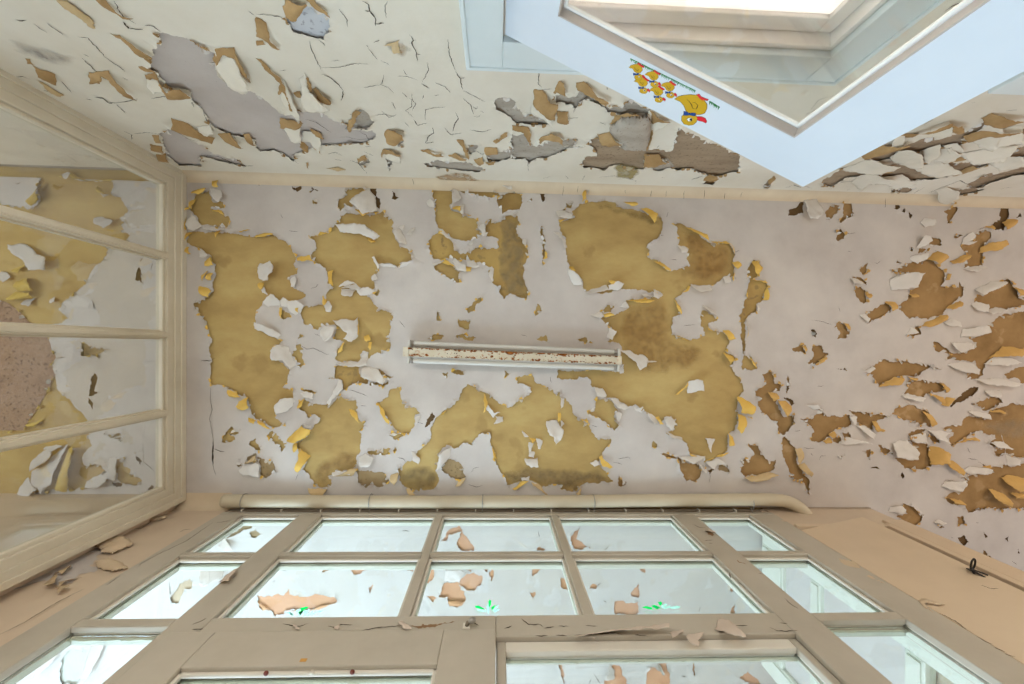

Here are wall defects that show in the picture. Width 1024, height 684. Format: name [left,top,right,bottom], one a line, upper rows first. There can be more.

spalling [110,17,404,171]
crack [249,1,488,173]
spalling [421,81,740,184]
peeling [184,113,1024,546]